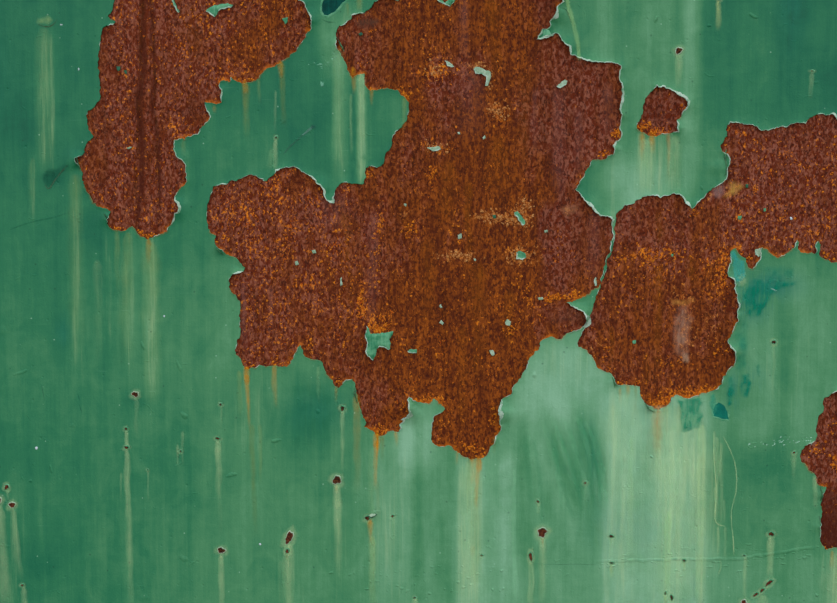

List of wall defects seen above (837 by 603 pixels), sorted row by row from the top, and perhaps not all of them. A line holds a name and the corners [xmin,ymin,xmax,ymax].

peeling [320,0,348,18]
corrosion [74,0,312,239]
corrosion [206,0,837,459]
peeling [678,375,751,430]
corrosion [285,530,294,554]